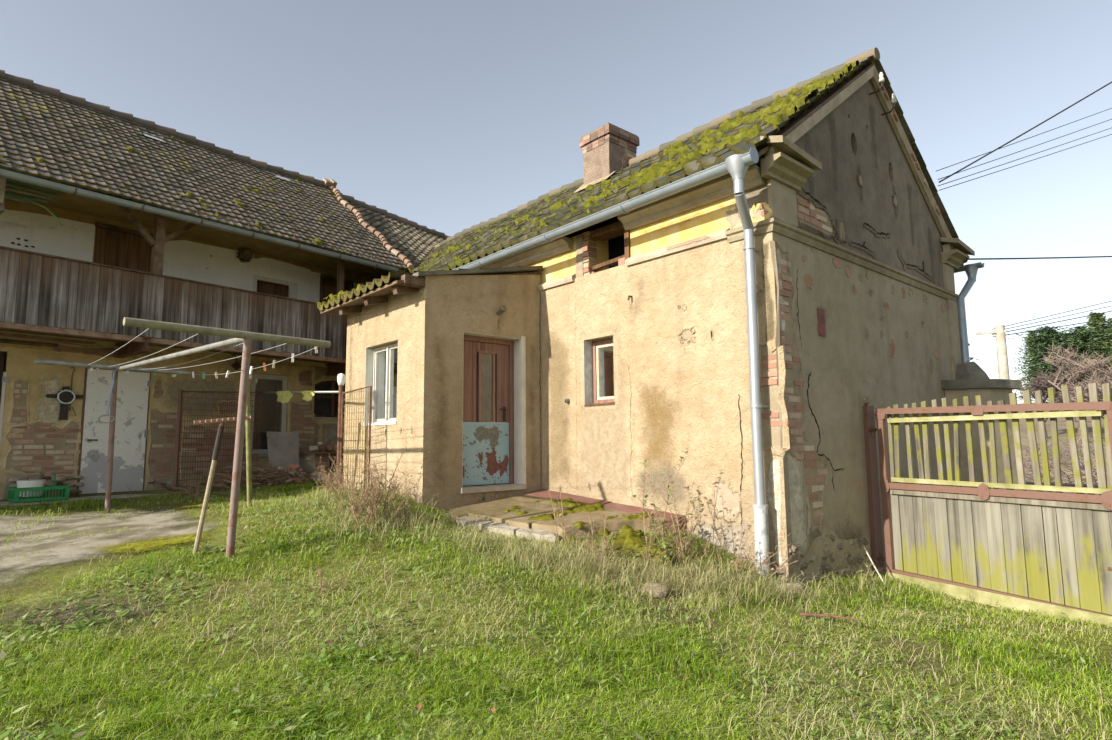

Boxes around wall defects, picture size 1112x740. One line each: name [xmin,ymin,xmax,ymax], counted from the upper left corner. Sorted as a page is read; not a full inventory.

flaking render [725,202,772,229]
flaking render [756,191,847,538]
flaking render [3,377,99,478]
peeling [463,425,509,502]
leakage [641,392,683,498]
peeling [691,478,742,552]
crack [732,393,746,554]